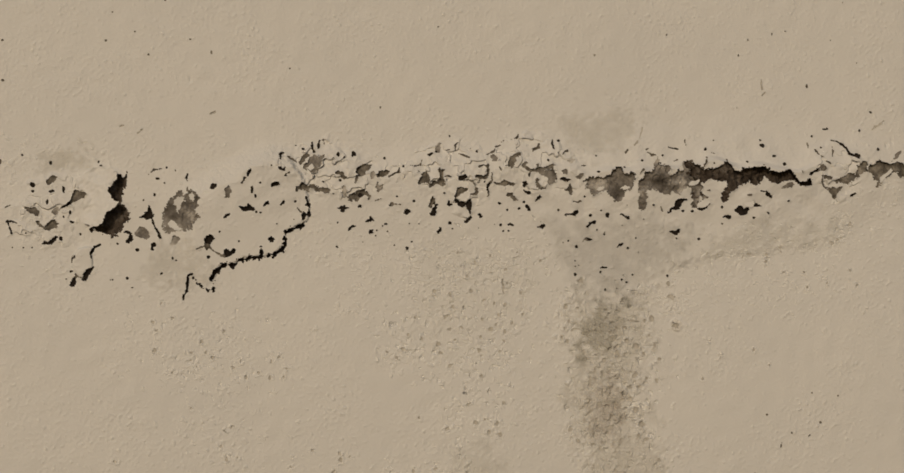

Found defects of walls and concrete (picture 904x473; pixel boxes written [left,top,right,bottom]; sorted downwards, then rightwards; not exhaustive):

peeling [814,134,904,205]
peeling [3,166,131,290]
spalling [135,226,150,240]
crack [182,221,307,300]
peeling [161,130,707,305]